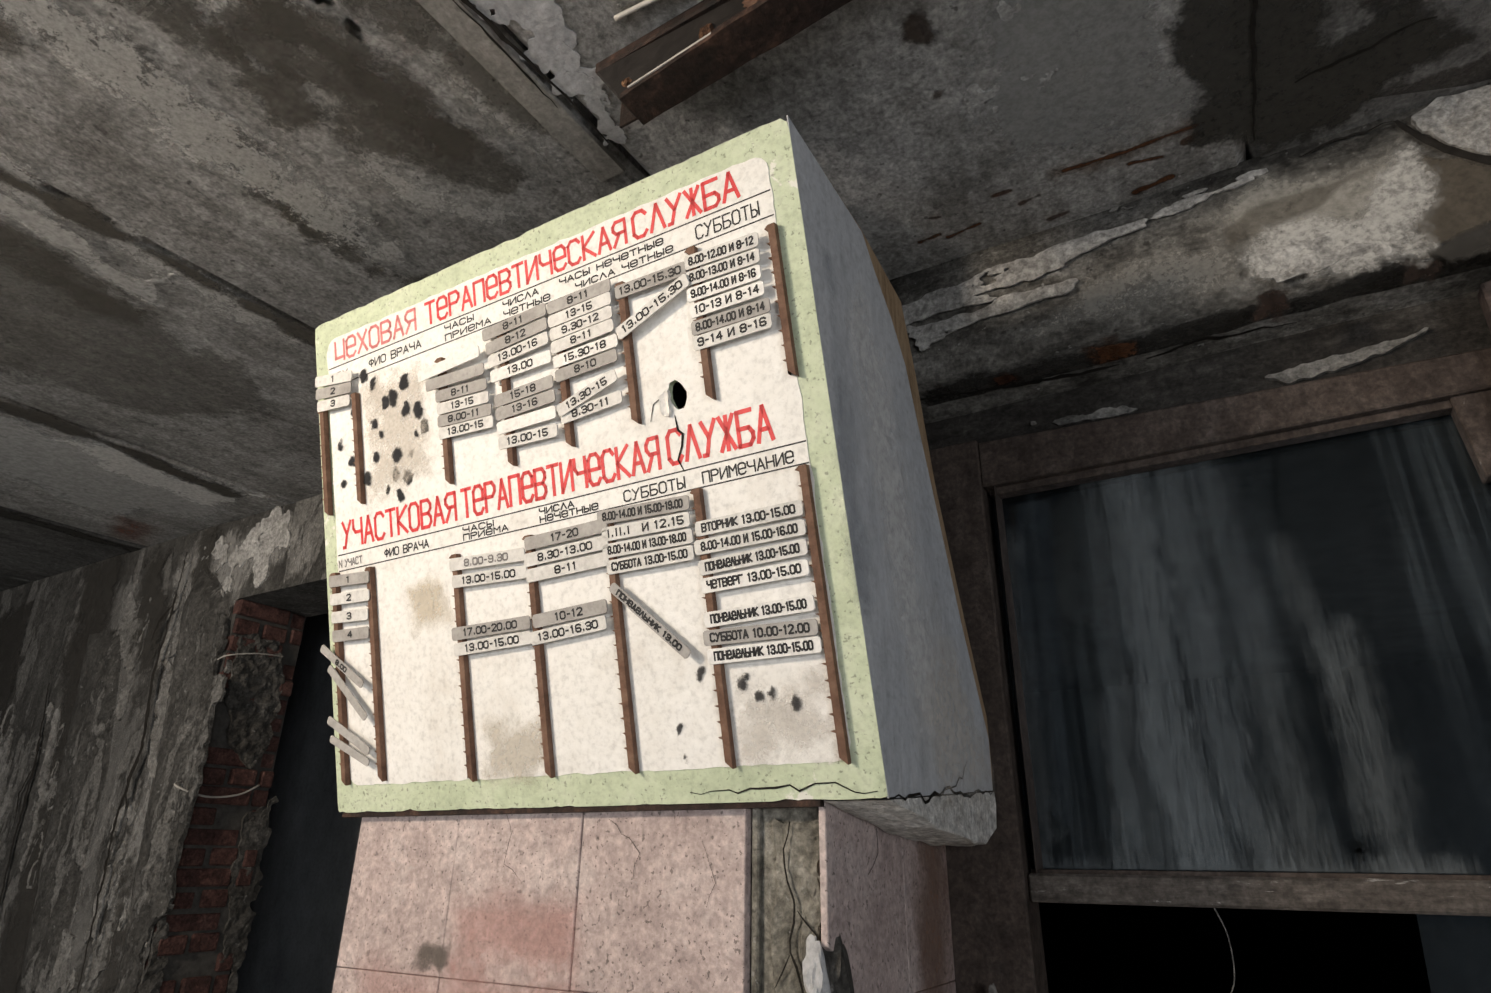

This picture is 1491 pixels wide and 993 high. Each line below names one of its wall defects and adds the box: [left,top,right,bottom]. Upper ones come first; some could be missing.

water stain [0,0,559,286]
peeling [469,0,627,146]
rust [901,10,936,44]
rust [917,216,982,244]
rust [1061,124,1197,194]
flaking render [902,84,1491,352]
water stain [965,0,1491,161]
crack [1250,0,1258,141]
crack [1294,16,1437,83]
water stain [0,399,310,993]
peeling [49,506,293,993]
spalling [798,872,854,993]